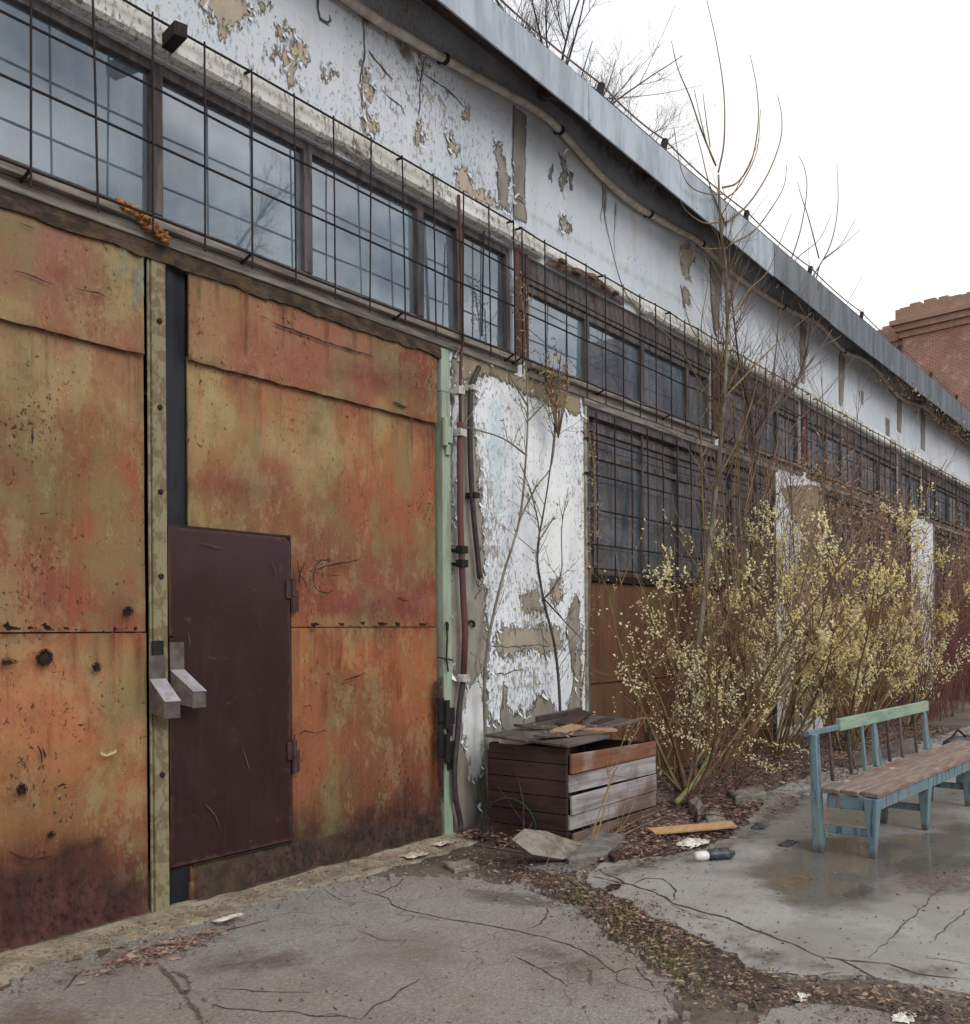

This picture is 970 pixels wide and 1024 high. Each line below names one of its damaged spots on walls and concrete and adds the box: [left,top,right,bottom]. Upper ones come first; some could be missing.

peeling [195,0,340,91]
peeling [358,58,380,140]
peeling [413,120,429,151]
peeling [444,124,520,215]
peeling [547,148,574,196]
peeling [558,211,573,236]
peeling [680,242,712,313]
peeling [450,352,587,831]
rust [433,677,444,802]
crack [327,878,654,991]
crack [593,869,969,979]
crack [157,962,419,1024]